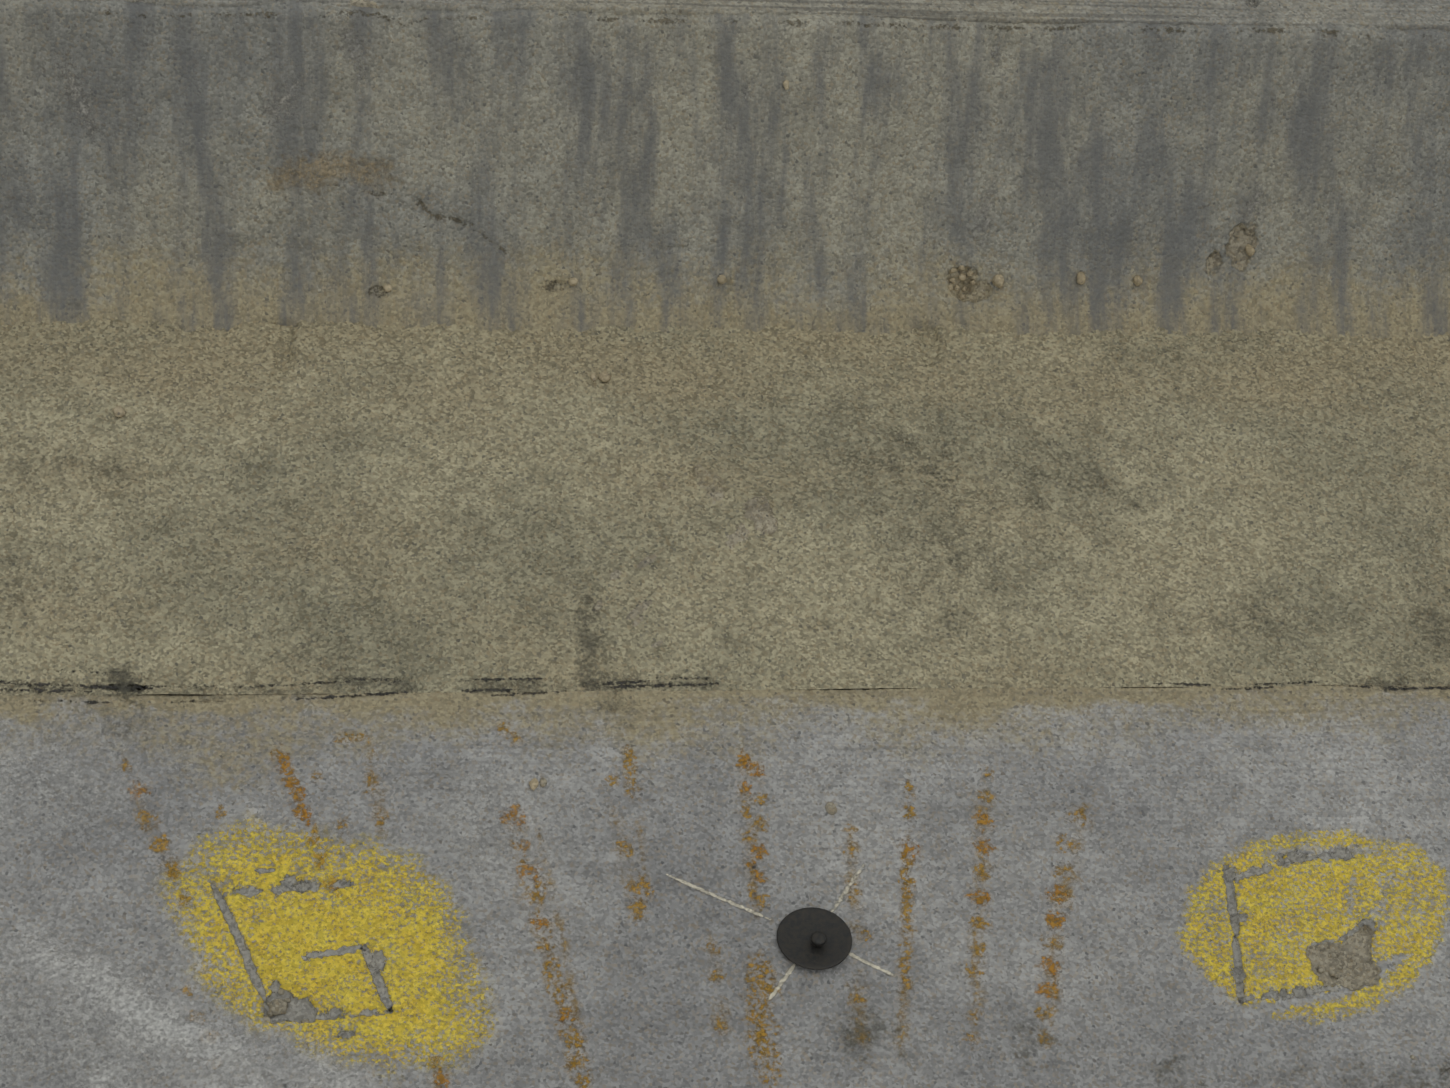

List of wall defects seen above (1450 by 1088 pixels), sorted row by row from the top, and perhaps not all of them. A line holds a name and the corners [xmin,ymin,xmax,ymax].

peeling [280,874,310,893]
corrosion [270,749,339,897]
spalling [263,980,355,1039]
peeling [369,950,386,975]
corrosion [500,804,590,1088]
corrosion [745,954,782,1085]
corrosion [898,843,919,1005]
corrosion [965,769,996,1040]
corrosion [1034,806,1087,1044]
peeling [1232,967,1246,986]
spalling [1278,919,1382,998]
peeling [1331,847,1353,861]